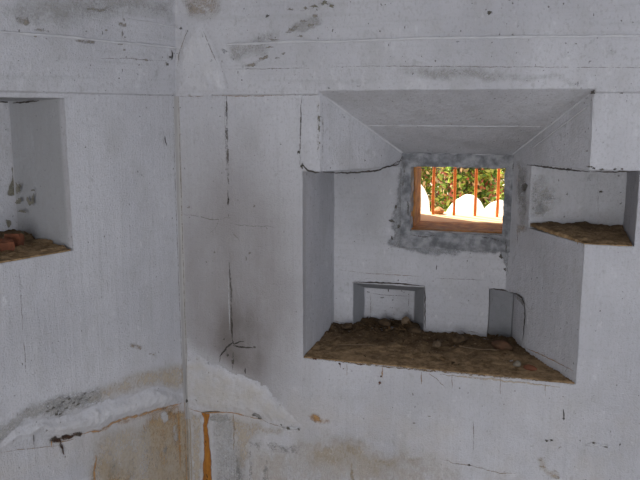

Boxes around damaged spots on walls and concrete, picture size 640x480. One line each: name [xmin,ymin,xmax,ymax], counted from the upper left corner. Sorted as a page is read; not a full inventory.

crack [297,95,489,215]
crack [165,95,276,334]
crack [219,267,256,374]
damp [93,403,261,480]
rust [202,413,212,480]